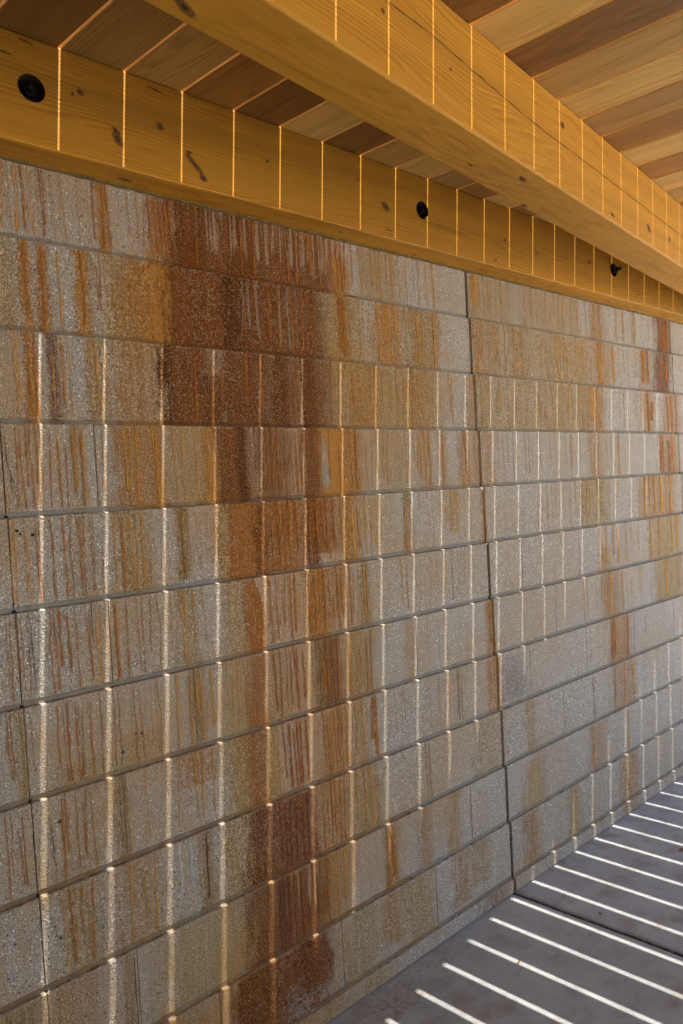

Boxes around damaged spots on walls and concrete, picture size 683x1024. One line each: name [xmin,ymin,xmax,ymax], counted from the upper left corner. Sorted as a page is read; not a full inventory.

corrosion [0,161,445,1024]
corrosion [468,274,634,460]
corrosion [605,574,634,689]
corrosion [640,318,681,600]